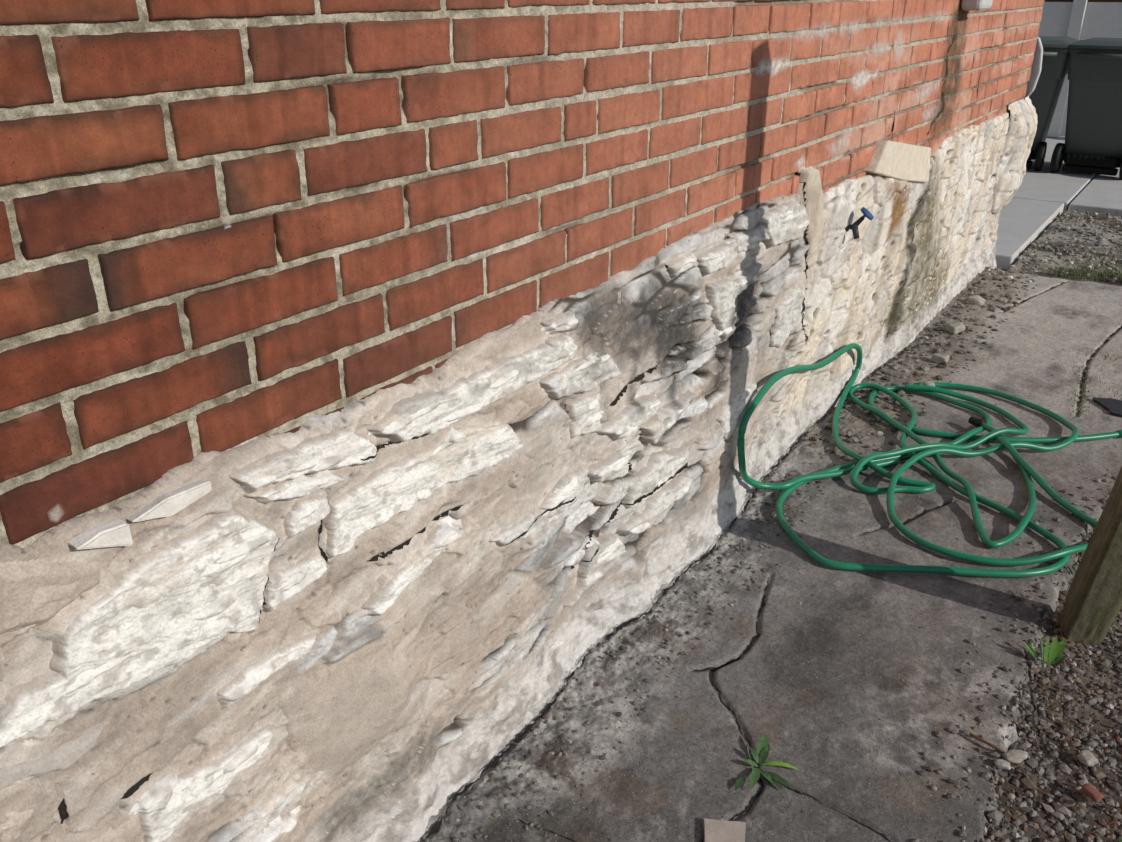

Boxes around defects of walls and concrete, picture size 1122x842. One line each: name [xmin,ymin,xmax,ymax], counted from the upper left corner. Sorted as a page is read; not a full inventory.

leakage [760,60,789,73]
leakage [852,71,877,88]
crack [800,253,808,342]
leakage [887,195,925,337]
leakage [714,281,758,385]
crack [1076,325,1122,416]
crack [361,434,430,461]
crack [318,501,332,571]
crack [367,505,464,562]
crack [425,345,911,842]
crack [58,799,69,824]
crack [121,773,152,799]